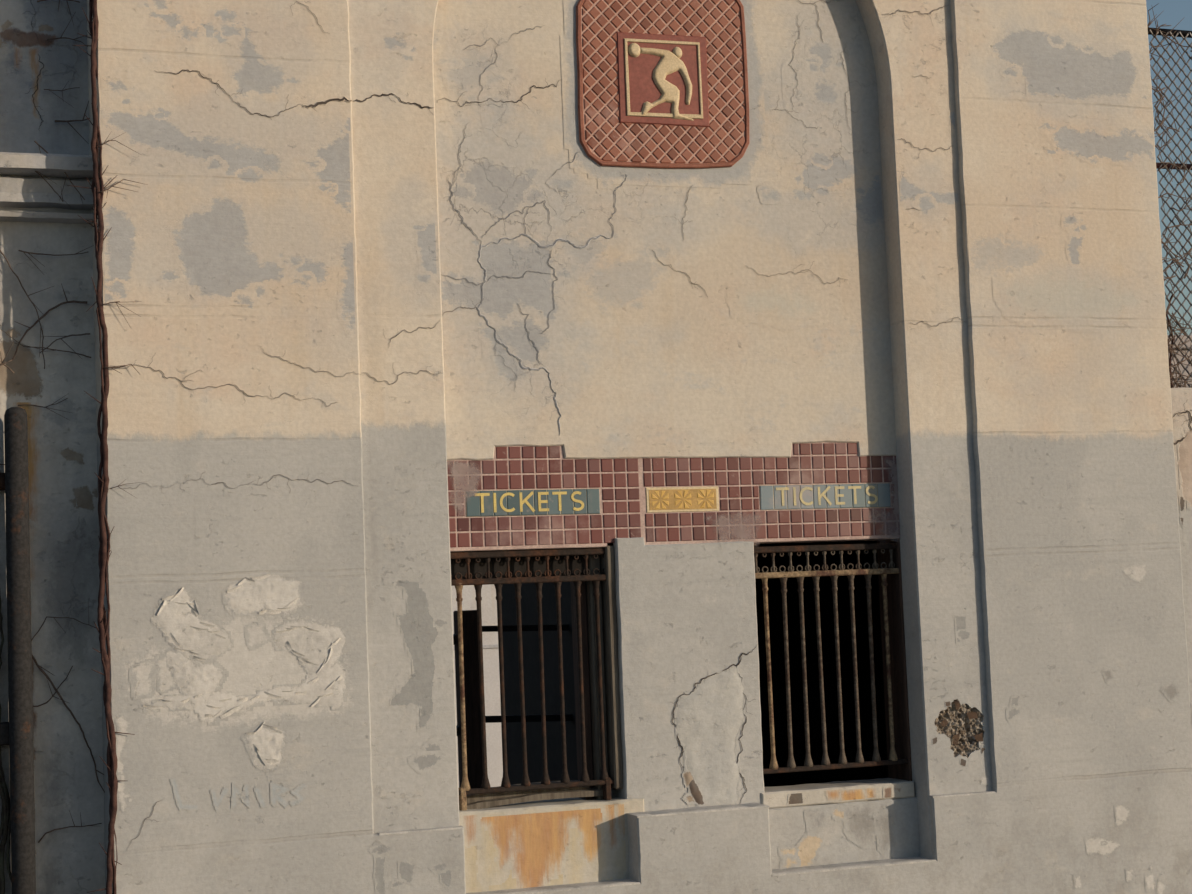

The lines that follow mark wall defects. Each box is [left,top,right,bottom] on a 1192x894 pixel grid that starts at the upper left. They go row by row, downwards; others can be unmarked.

crack [25,1,44,131]
crack [774,0,862,130]
crack [110,26,627,436]
crack [1172,399,1192,445]
peeling [139,572,348,726]
peeling [241,722,287,773]
crack [672,646,757,803]
spalling [932,699,985,767]
corrosion [460,804,625,889]